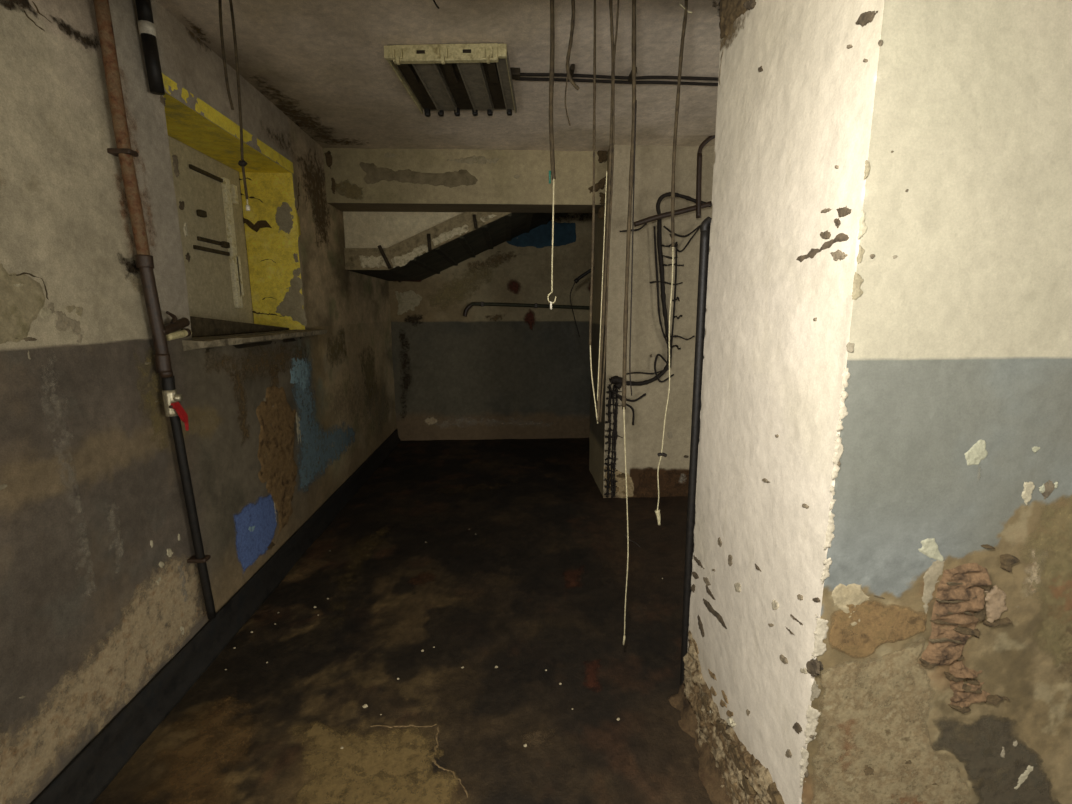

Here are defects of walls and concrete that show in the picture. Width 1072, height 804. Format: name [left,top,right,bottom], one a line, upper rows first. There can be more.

leakage [0,0,97,49]
peeling [0,262,83,360]
peeling [275,202,294,234]
peeling [276,253,307,326]
flaking render [796,206,875,300]
peeling [290,358,355,491]
peeling [234,495,277,571]
peeling [785,367,1059,804]
leakage [0,534,207,804]
flaking render [683,556,785,804]
leakage [149,697,253,804]